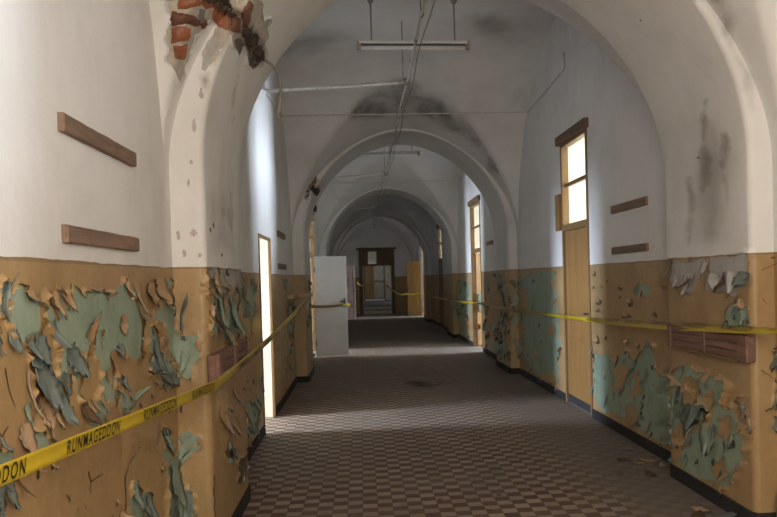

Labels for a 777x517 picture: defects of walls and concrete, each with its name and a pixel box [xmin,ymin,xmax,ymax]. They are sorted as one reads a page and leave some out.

flaking render [150,0,272,91]
flaking render [302,173,321,203]
peeling [0,479,37,517]
peeling [0,253,258,465]
peeling [112,406,205,517]
peeling [219,377,266,491]
peeling [456,269,565,391]
peeling [588,335,756,495]
peeling [617,247,757,335]
peeling [769,345,777,432]